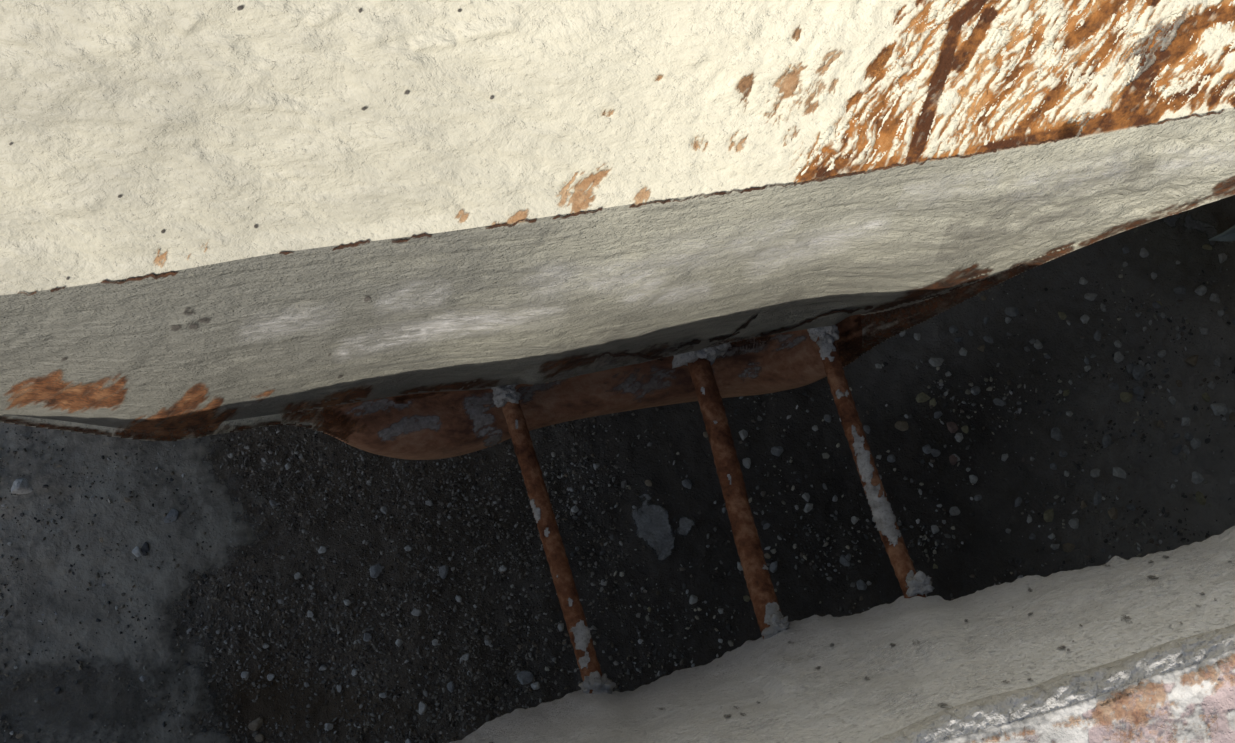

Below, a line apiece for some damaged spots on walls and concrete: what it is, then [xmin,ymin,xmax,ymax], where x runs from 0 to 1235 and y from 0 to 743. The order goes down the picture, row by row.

rust [736,73,754,107]
rust [764,50,843,146]
rust [794,0,1235,182]
rust [728,132,747,152]
rust [557,164,610,214]
rust [0,370,372,443]
peeling [346,398,441,441]
peeling [464,392,518,448]
peeling [852,425,901,546]
peeling [530,499,550,537]
peeling [570,620,591,669]
spalling [870,624,1235,743]